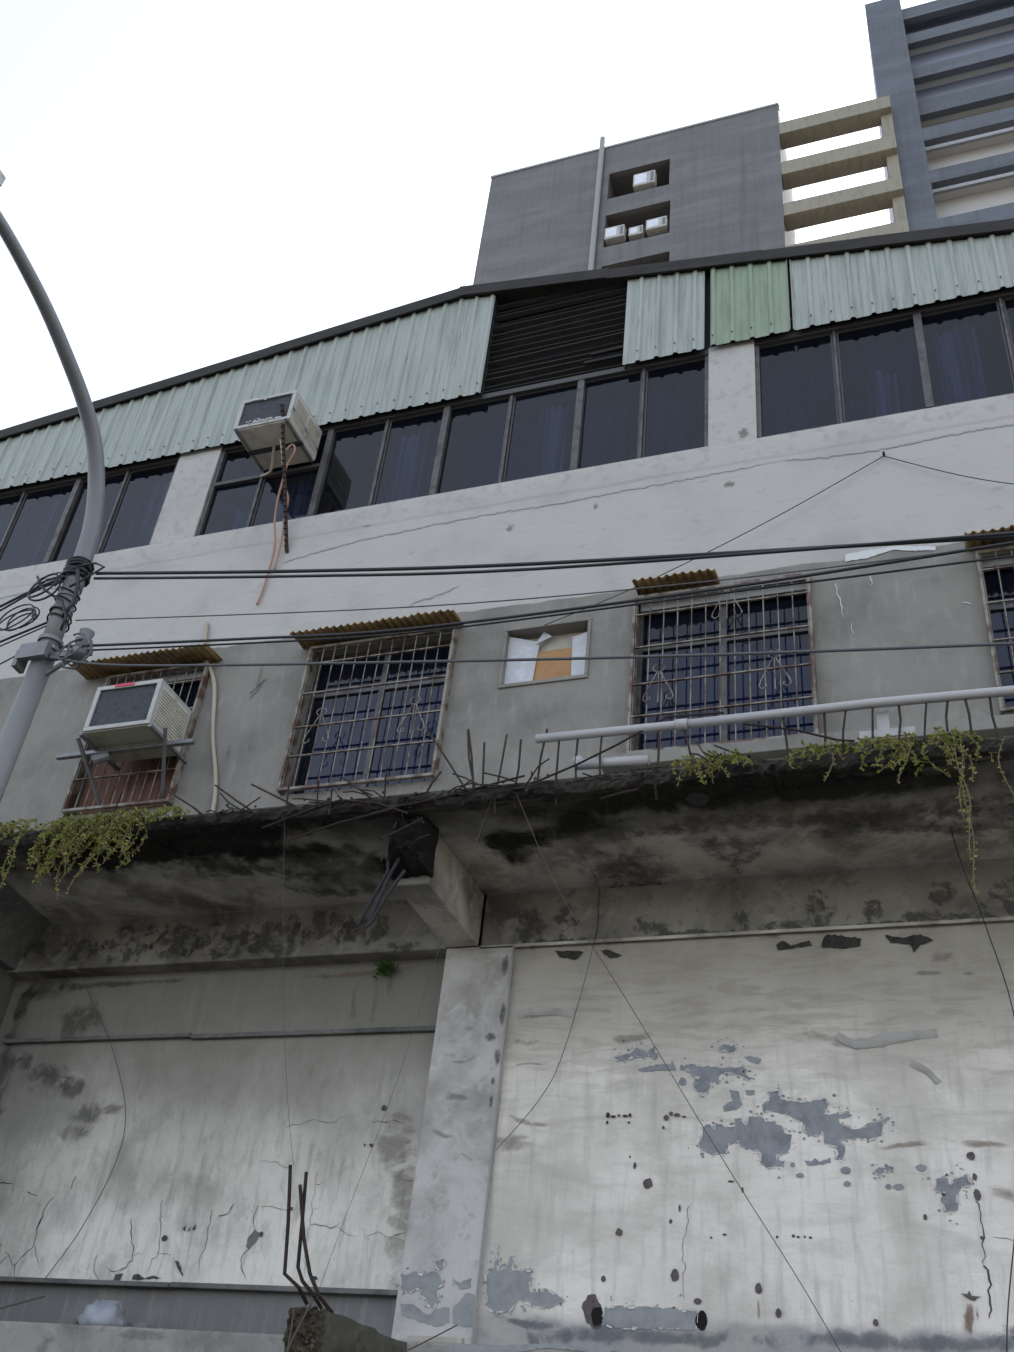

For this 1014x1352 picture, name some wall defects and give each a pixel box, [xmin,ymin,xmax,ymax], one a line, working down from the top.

water stain [485,765,1014,888]
water stain [23,818,418,964]
water stain [634,912,748,942]
water stain [847,878,1014,926]
peeling [613,1037,895,1186]
crack [0,1176,76,1277]
crack [94,1160,401,1280]
spalling [283,1165,334,1313]
peeling [393,1246,568,1327]
peeling [582,1269,702,1337]
peeling [915,1152,981,1225]
crack [975,1201,1014,1318]